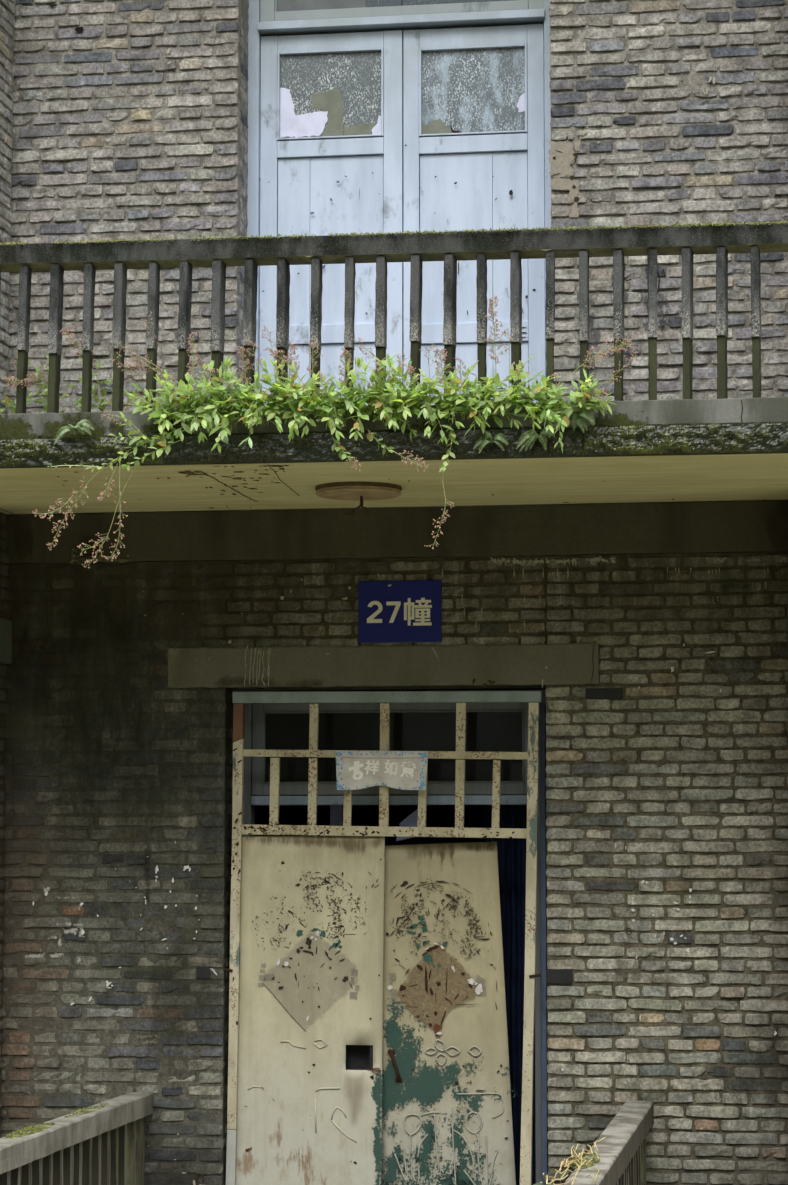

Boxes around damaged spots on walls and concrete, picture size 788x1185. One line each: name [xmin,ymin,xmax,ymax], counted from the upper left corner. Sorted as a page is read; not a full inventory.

peeling [252,869,497,1003]
peeling [371,994,517,1185]